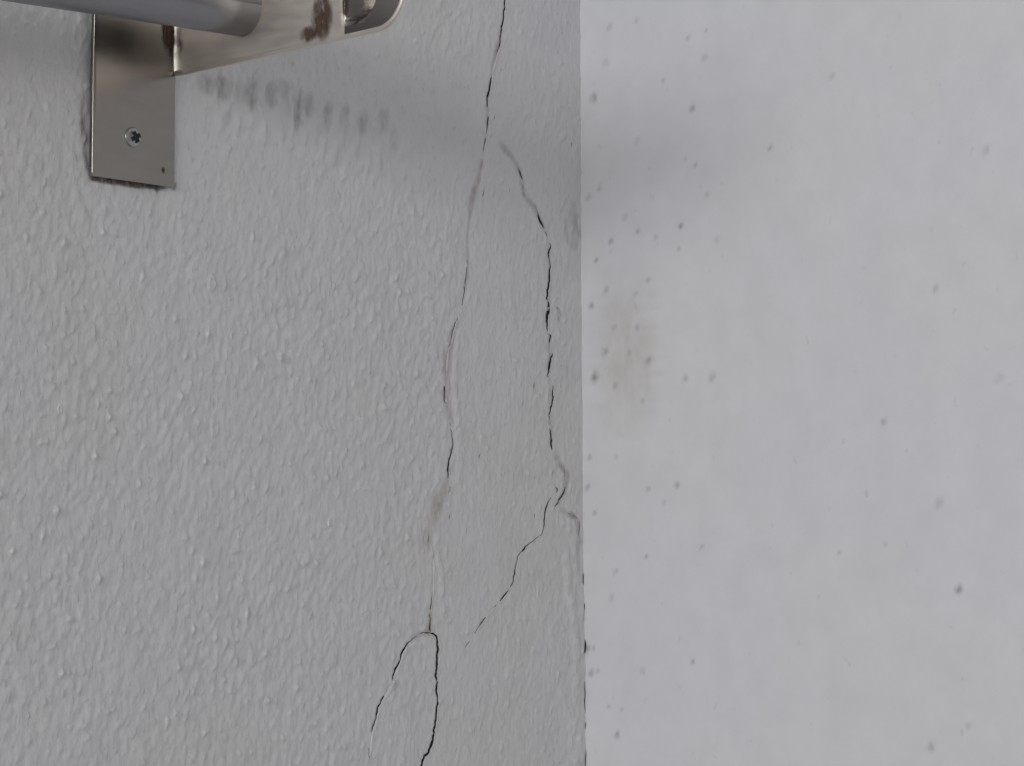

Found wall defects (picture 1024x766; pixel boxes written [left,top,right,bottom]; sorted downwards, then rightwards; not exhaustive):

crack [482,0,507,162]
crack [444,267,467,518]
crack [468,170,580,643]
crack [369,537,441,766]